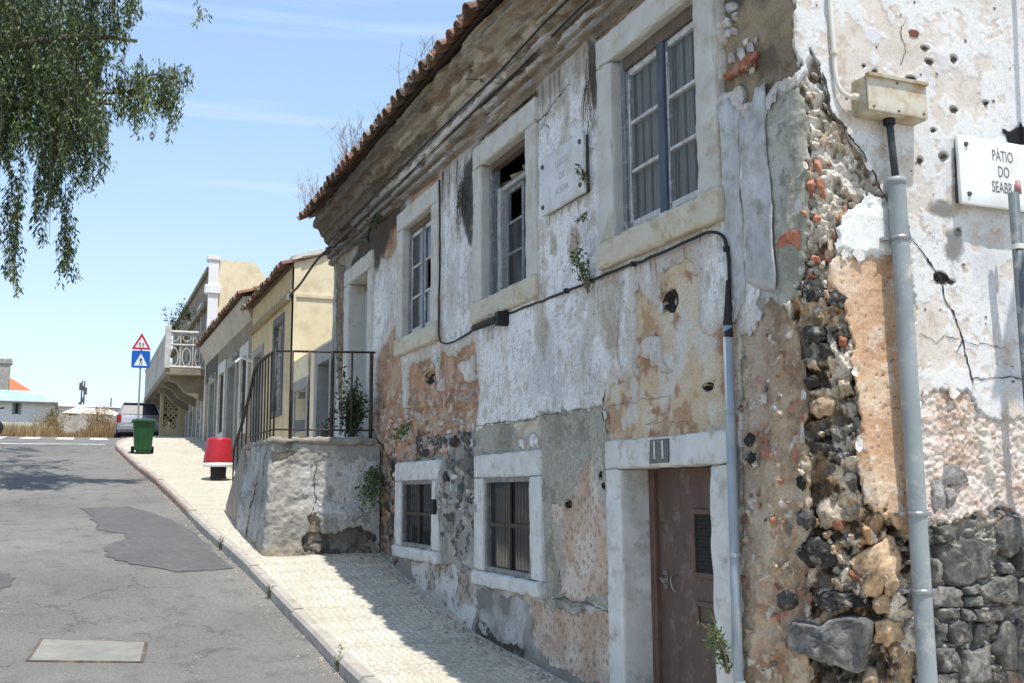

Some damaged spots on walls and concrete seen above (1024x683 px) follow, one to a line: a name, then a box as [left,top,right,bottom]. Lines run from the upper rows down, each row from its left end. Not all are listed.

spalling [302,328,480,630]
leakage [442,156,473,244]
spalling [528,0,918,683]
crack [909,226,1022,390]
flaking render [920,382,1024,683]